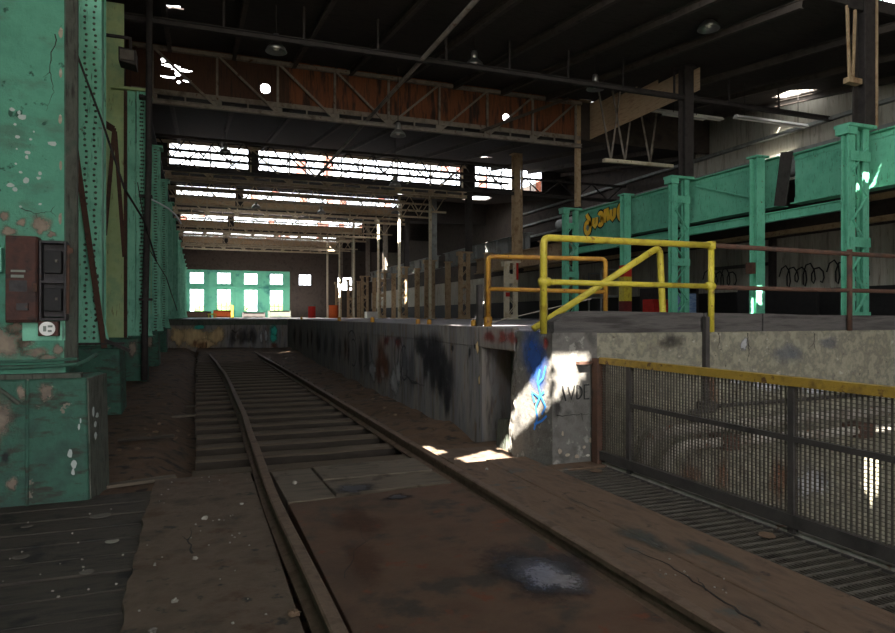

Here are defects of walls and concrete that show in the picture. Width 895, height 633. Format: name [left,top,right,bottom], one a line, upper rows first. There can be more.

crack [45,34,57,111]
peeling [6,107,42,191]
spalling [0,205,62,237]
crack [624,545,762,627]